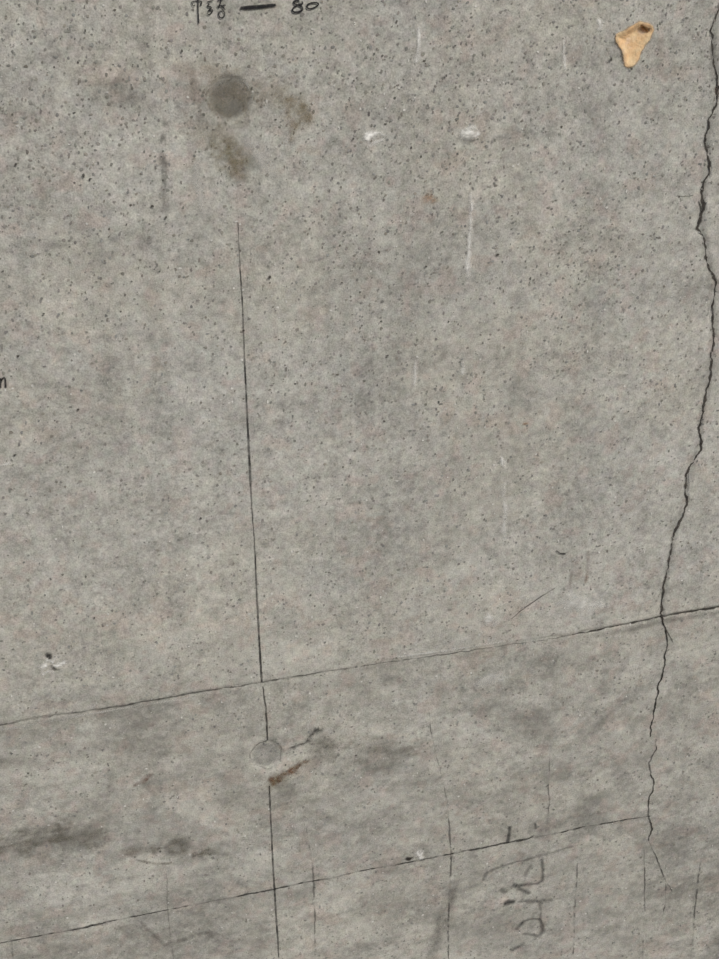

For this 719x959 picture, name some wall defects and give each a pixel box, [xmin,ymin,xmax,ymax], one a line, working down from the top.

crack [644,10,719,911]